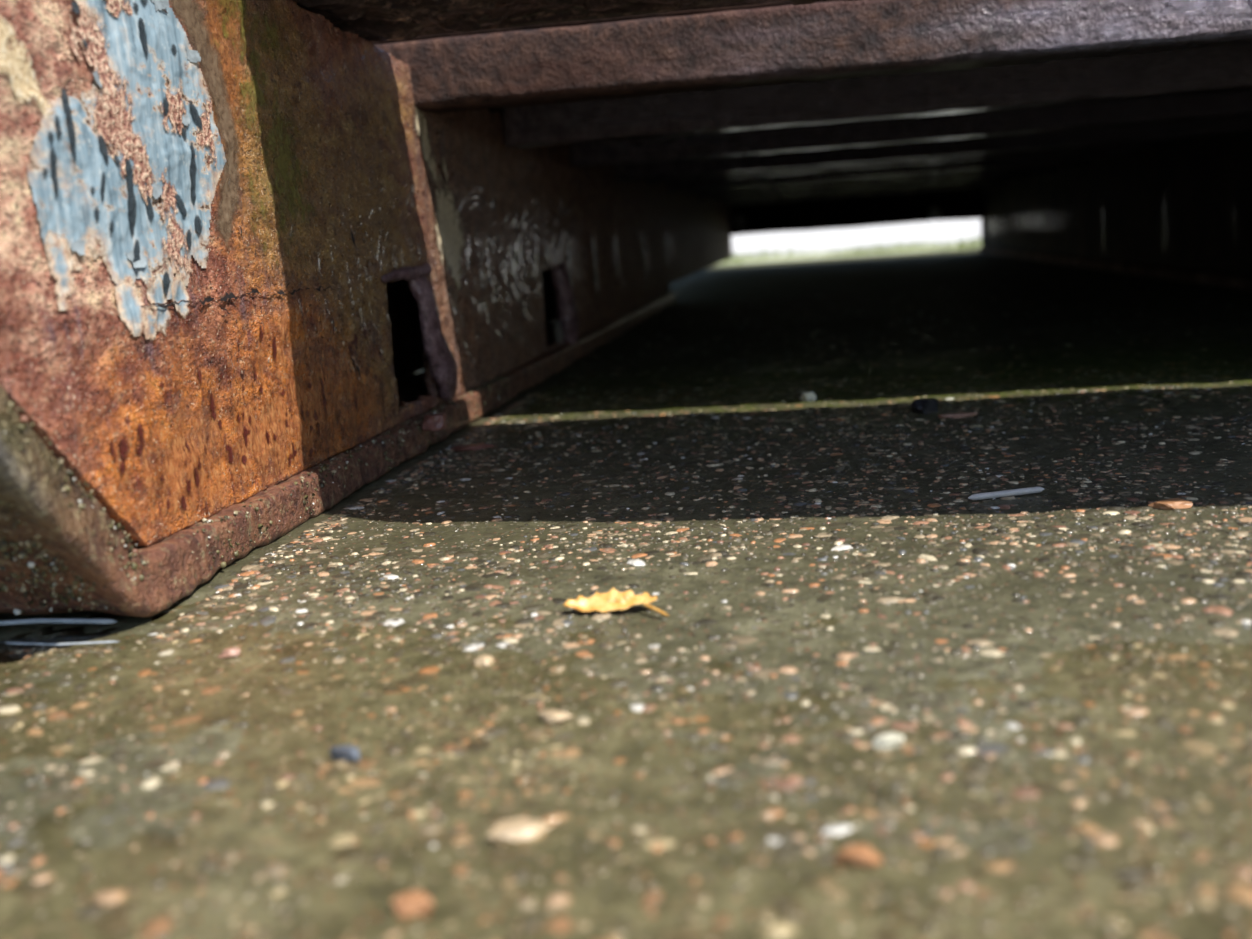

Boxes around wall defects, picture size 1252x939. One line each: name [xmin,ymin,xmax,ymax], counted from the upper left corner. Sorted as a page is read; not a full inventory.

peeling [0,0,226,340]
rust [145,314,374,513]
rust [422,413,448,431]